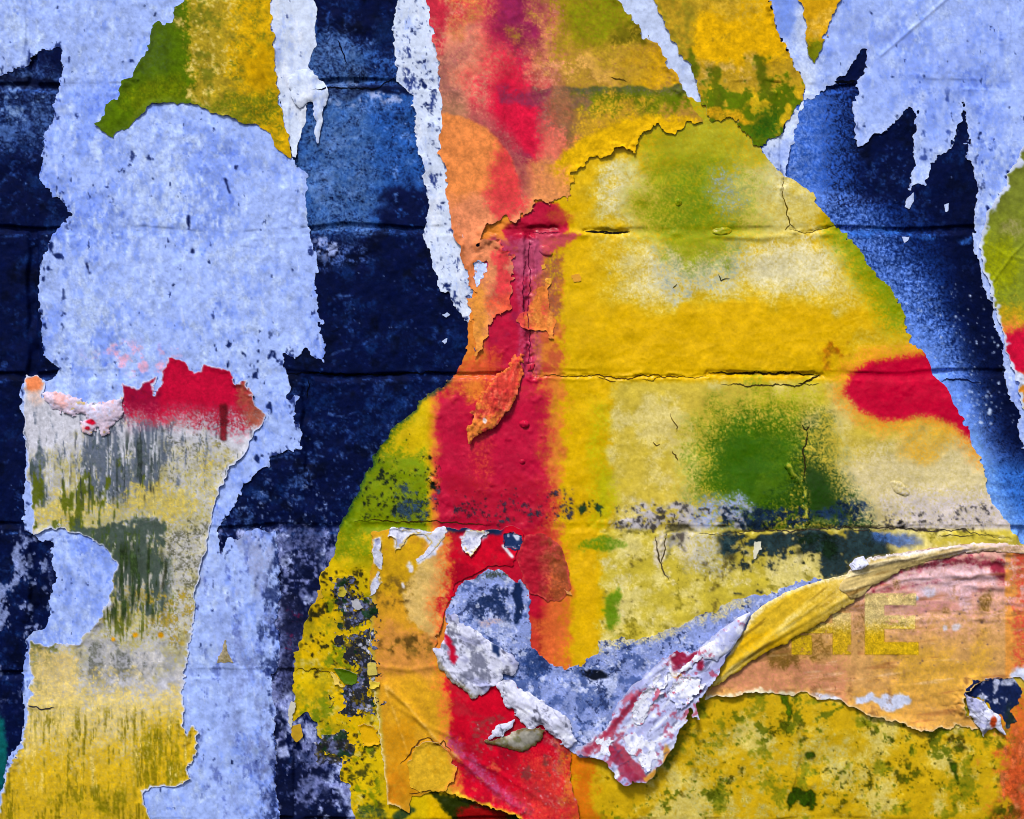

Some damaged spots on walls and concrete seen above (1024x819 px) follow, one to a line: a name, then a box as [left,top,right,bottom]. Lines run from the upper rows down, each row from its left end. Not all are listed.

crack [585,228,630,236]
crack [782,181,836,233]
peeling [473,260,487,287]
peeling [516,264,556,339]
crack [522,232,819,387]
peeling [467,354,535,444]
crack [801,425,809,477]
peeling [964,677,1023,729]